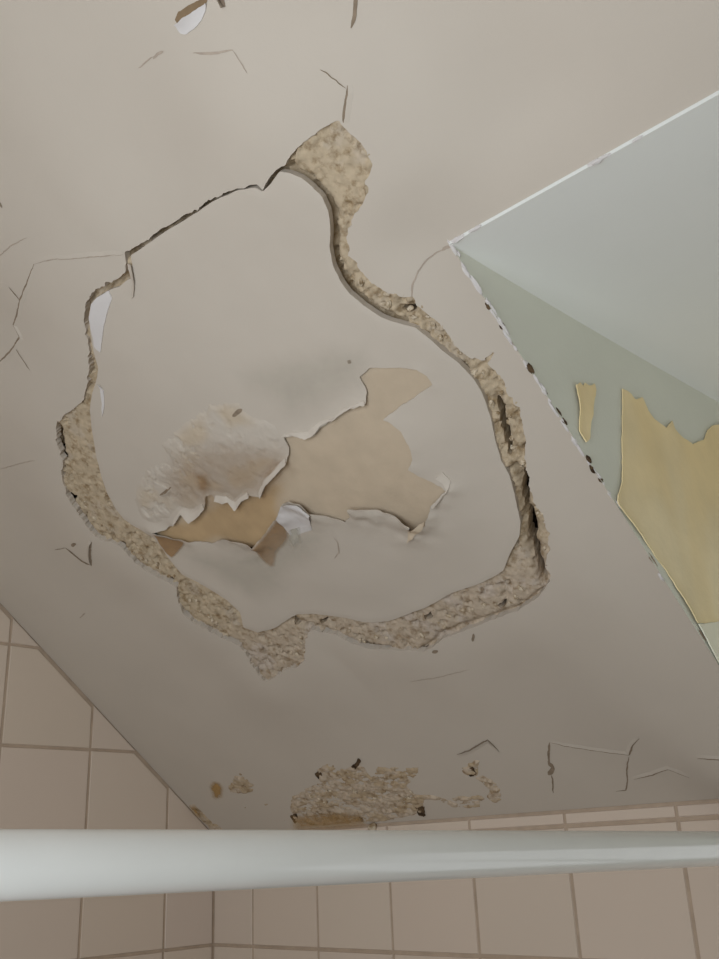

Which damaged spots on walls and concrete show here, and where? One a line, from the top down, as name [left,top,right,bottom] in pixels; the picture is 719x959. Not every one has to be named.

crack [350,0,358,28]
crack [194,50,247,73]
crack [321,70,353,123]
crack [0,264,37,369]
spalling [447,225,620,507]
flaking render [59,121,551,679]
damp [155,536,183,557]
damp [254,522,298,566]
crack [547,737,719,792]
flaking render [284,758,501,830]